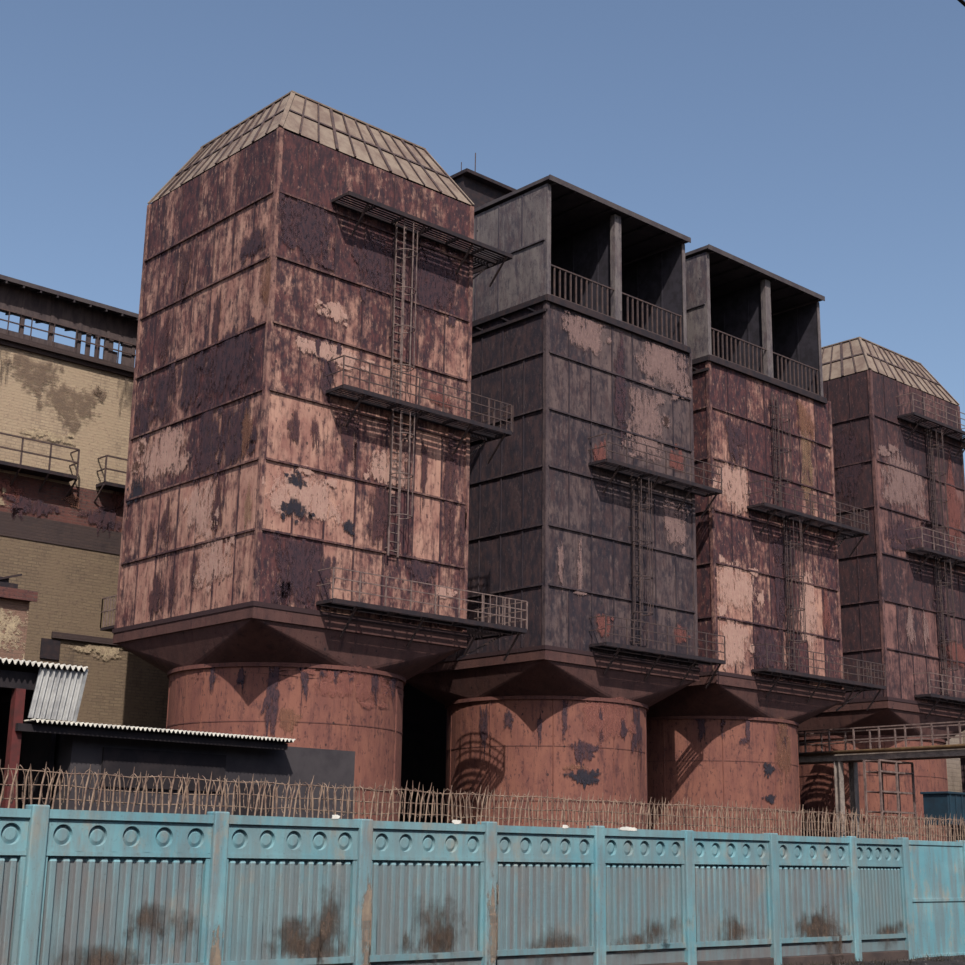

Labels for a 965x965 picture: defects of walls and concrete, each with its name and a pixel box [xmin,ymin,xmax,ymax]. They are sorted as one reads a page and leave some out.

rust [239,228,271,306]
rust [209,289,221,397]
rust [145,494,171,562]
rust [211,484,223,535]
rust [287,410,319,454]
rust [368,481,396,568]
rust [420,437,428,520]
rust [429,393,467,578]
rust [726,417,746,477]
rust [148,572,176,620]
spalling [0,608,28,660]
rust [260,665,361,737]